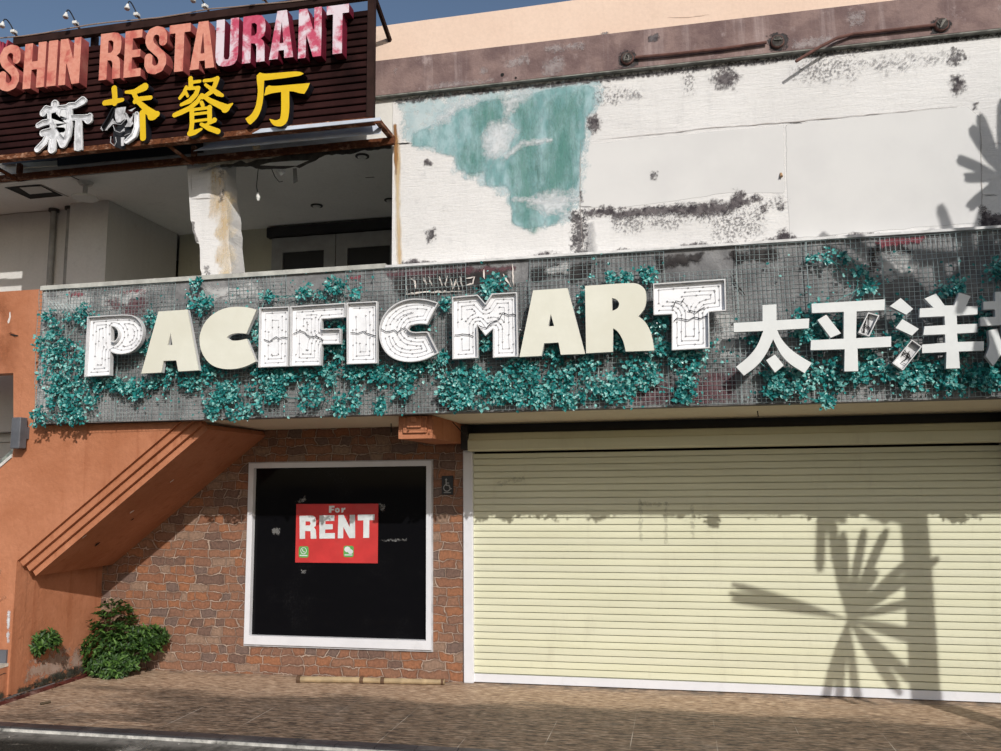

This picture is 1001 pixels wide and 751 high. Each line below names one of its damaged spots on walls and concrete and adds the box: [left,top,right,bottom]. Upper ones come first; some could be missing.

damp [396,33,1001,104]
peeling [398,78,603,231]
damp [568,191,797,253]